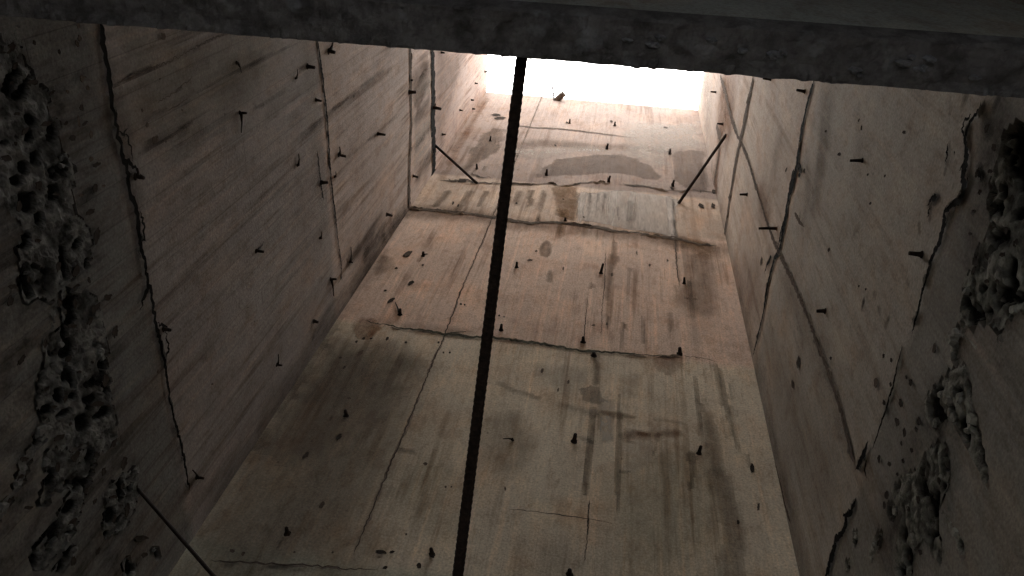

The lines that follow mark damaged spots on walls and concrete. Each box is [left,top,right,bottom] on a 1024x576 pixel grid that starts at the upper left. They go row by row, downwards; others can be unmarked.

spalling [0,24,128,576]
crack [100,24,224,490]
crack [212,41,985,576]
spalling [877,125,1024,576]